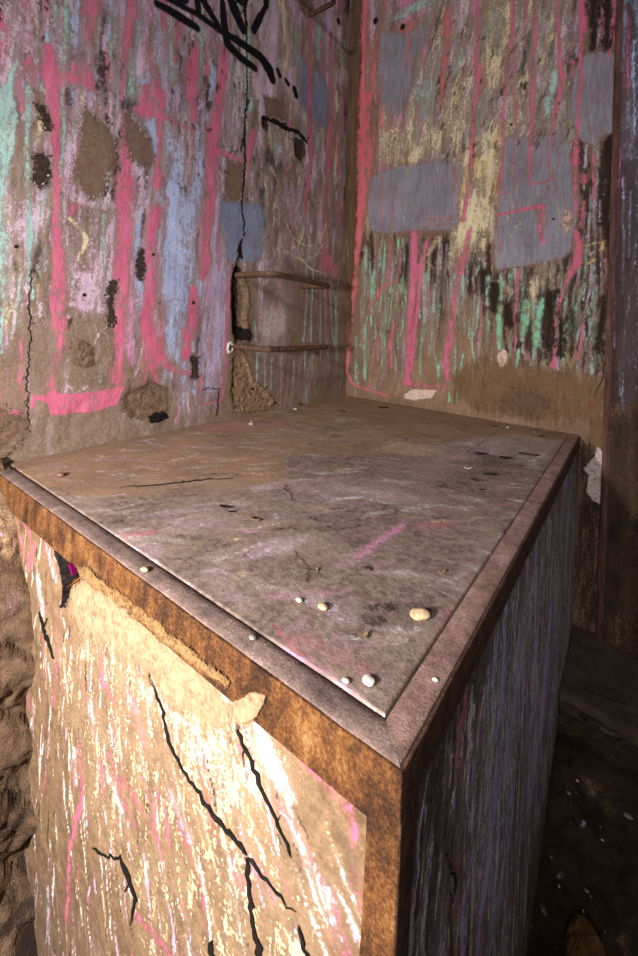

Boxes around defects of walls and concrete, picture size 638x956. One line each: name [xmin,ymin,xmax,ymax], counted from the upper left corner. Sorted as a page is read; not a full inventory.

peeling [70,106,155,201]
crack [232,0,308,275]
spalling [0,404,30,459]
flaking render [121,380,169,421]
flaking render [229,351,275,414]
crack [124,478,234,487]
spalling [0,487,20,569]
crack [146,668,309,956]
crack [92,848,137,922]